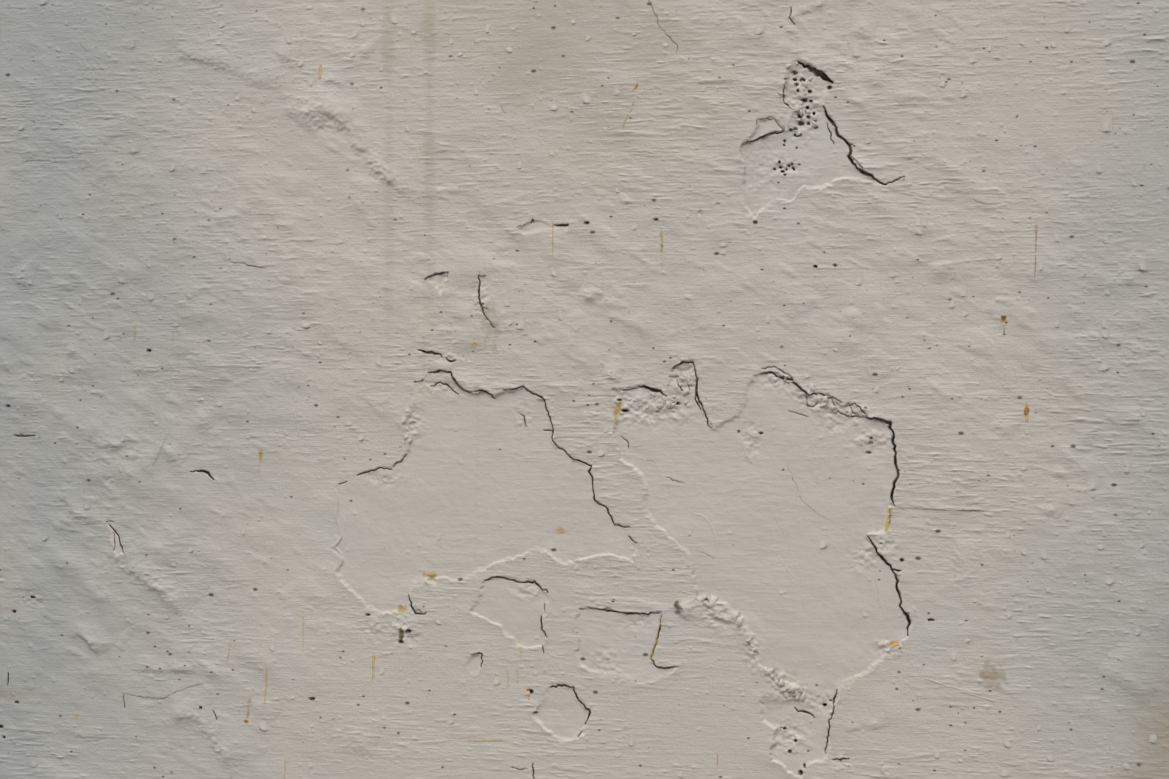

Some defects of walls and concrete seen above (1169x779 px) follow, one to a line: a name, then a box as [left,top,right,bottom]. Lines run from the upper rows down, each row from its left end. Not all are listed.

crack [746,62,901,185]
crack [630,361,711,428]
crack [420,350,634,542]
crack [762,366,983,630]
crack [489,576,547,653]
crack [582,607,676,669]
crack [552,685,591,735]
crack [795,695,846,760]